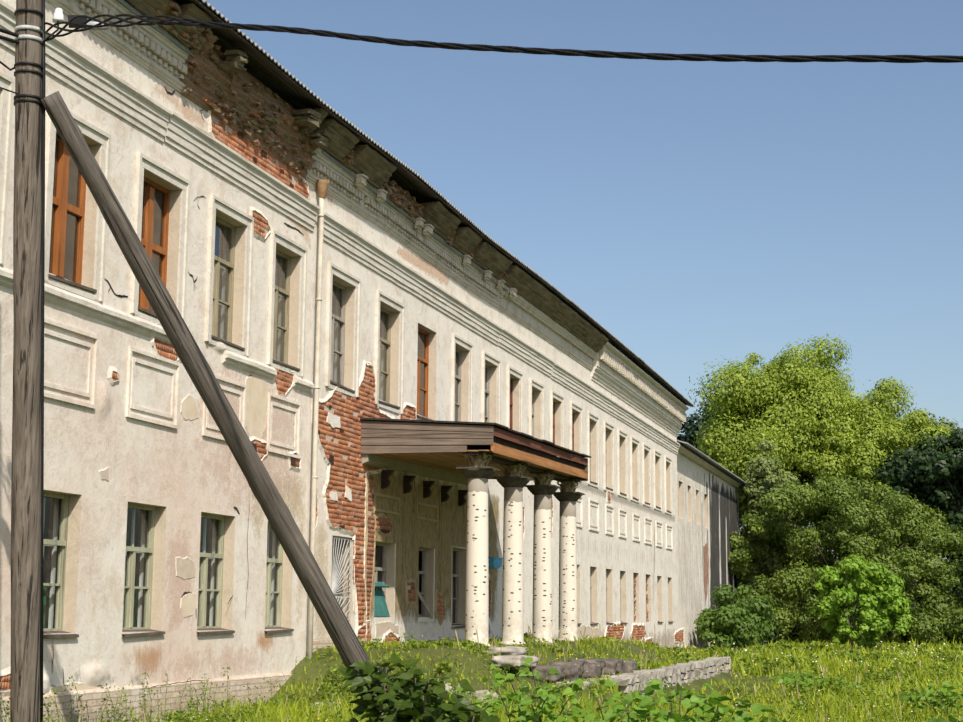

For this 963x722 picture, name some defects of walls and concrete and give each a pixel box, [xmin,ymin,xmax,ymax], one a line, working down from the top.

spalling [152,0,318,200]
flaking render [249,207,271,243]
flaking render [150,336,182,367]
peeling [245,362,295,462]
flaking render [287,450,301,473]
flaking render [309,360,417,645]
flaking render [577,621,653,645]